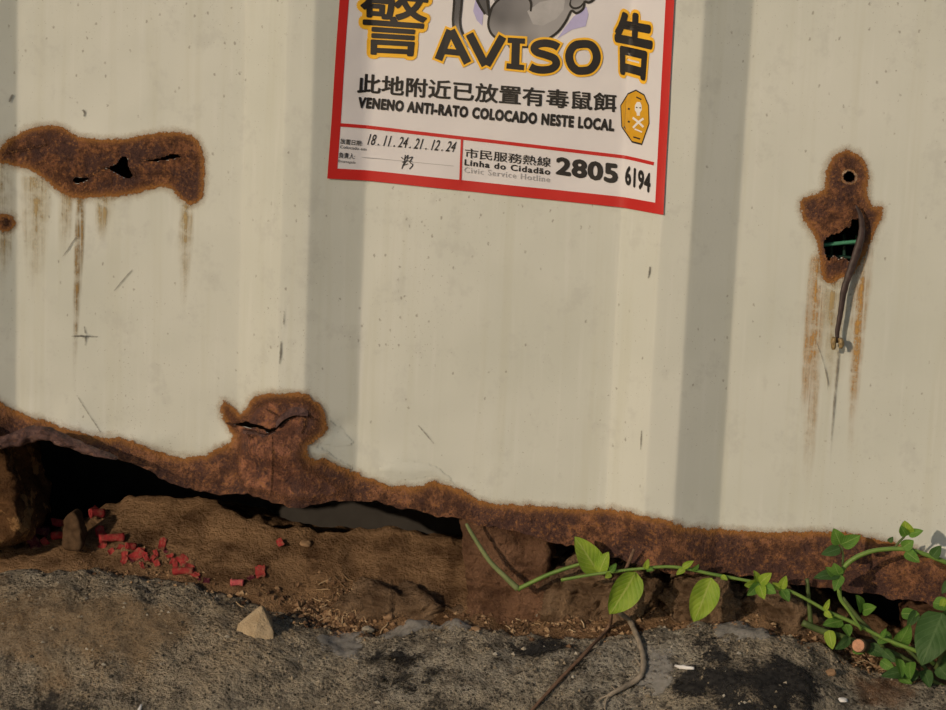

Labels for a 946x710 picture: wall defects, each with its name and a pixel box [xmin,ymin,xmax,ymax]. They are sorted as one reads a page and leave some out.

rust [0,124,205,310]
rust [800,149,884,418]
crack [226,409,279,492]
rust [0,392,946,606]